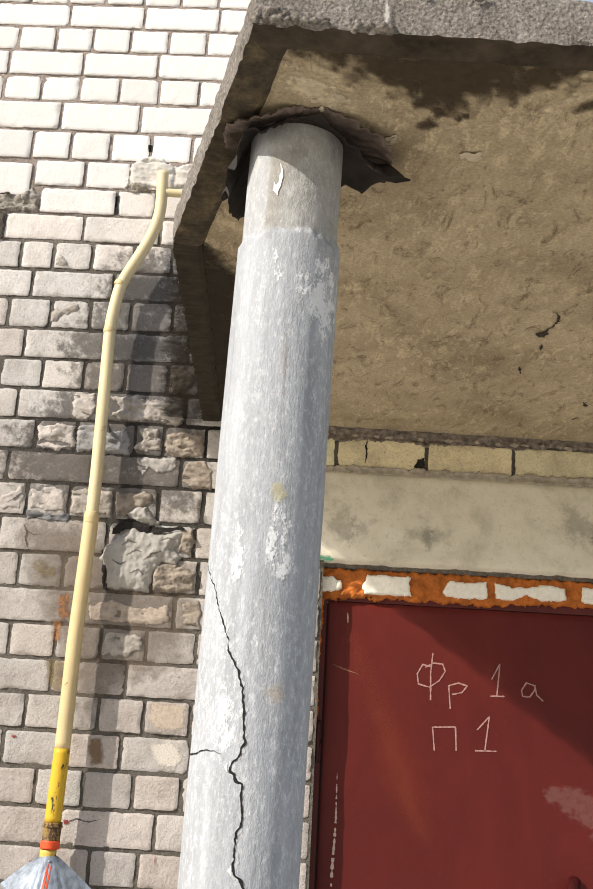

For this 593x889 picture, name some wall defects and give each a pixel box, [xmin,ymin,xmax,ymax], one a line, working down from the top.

leakage [280,49,593,130]
peeling [299,254,337,342]
crack [535,313,560,351]
spalling [37,392,96,452]
spalling [105,394,213,491]
spalling [0,485,88,514]
spalling [99,490,185,534]
peeling [232,514,245,579]
peeling [266,494,296,580]
spalling [88,565,170,658]
spalling [181,601,202,629]
crack [189,569,248,889]